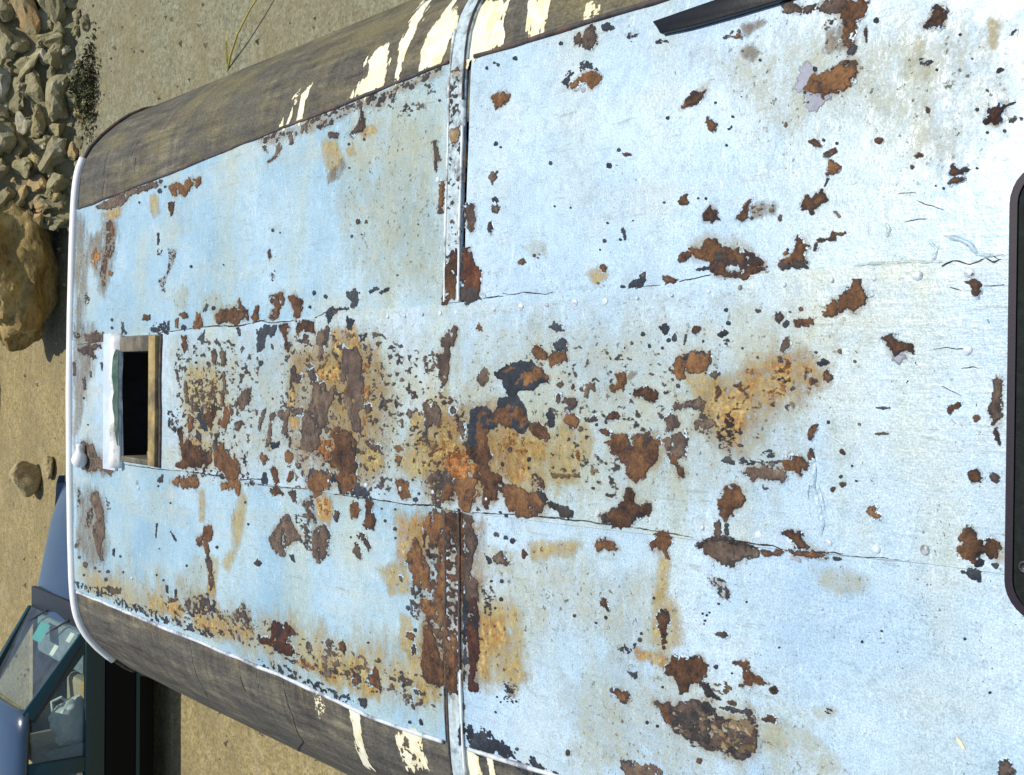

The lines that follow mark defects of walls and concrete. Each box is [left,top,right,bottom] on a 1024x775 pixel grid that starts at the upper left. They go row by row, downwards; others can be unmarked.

peeling [792,60,831,112]
rust [463,169,500,235]
rust [87,176,201,294]
rust [440,246,483,307]
rust [73,278,874,714]
crack [472,512,692,538]
crack [735,540,784,550]
crack [820,551,902,561]
peeling [719,700,747,714]
rust [457,723,558,775]